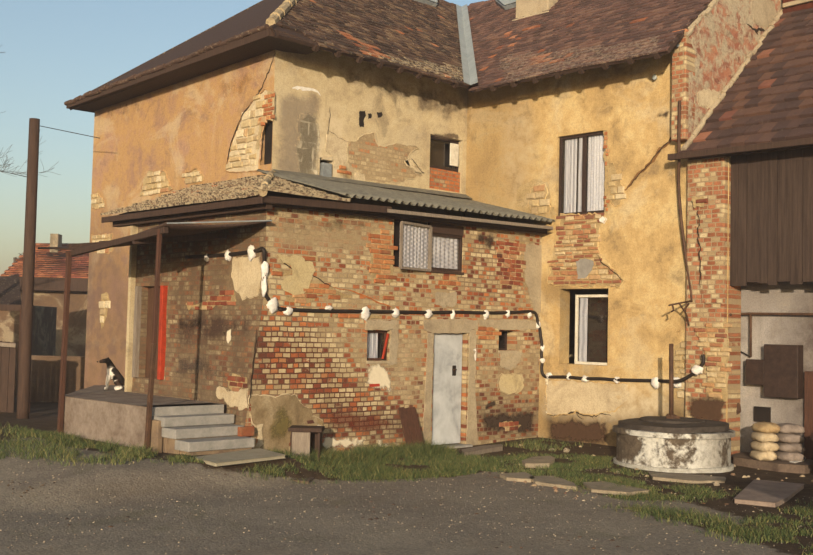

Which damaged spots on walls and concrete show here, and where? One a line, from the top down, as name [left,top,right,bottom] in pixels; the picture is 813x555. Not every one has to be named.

peeling [697,89,720,109]
spalling [225,88,275,174]
spalling [297,111,424,184]
crack [622,137,671,194]
spalling [496,130,627,314]
crack [695,211,703,285]
peeling [186,254,352,310]
peeling [545,379,630,417]
spalling [674,339,686,398]
spalling [694,321,732,402]
leakage [550,418,607,442]